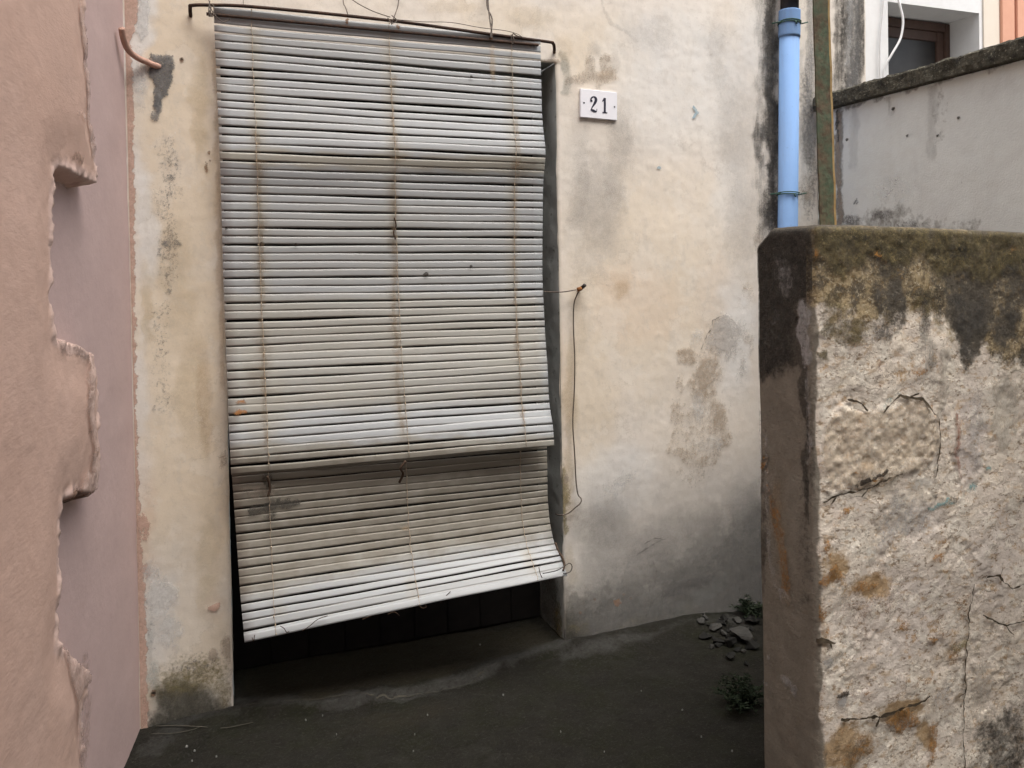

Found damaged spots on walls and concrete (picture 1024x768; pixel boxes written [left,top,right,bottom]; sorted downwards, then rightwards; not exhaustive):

damp [150,94,163,121]
damp [753,0,812,376]
spalling [57,339,99,503]
crack [848,393,941,476]
crack [823,473,903,504]
damp [148,682,231,727]
crack [841,696,930,727]
crack [961,569,1024,768]